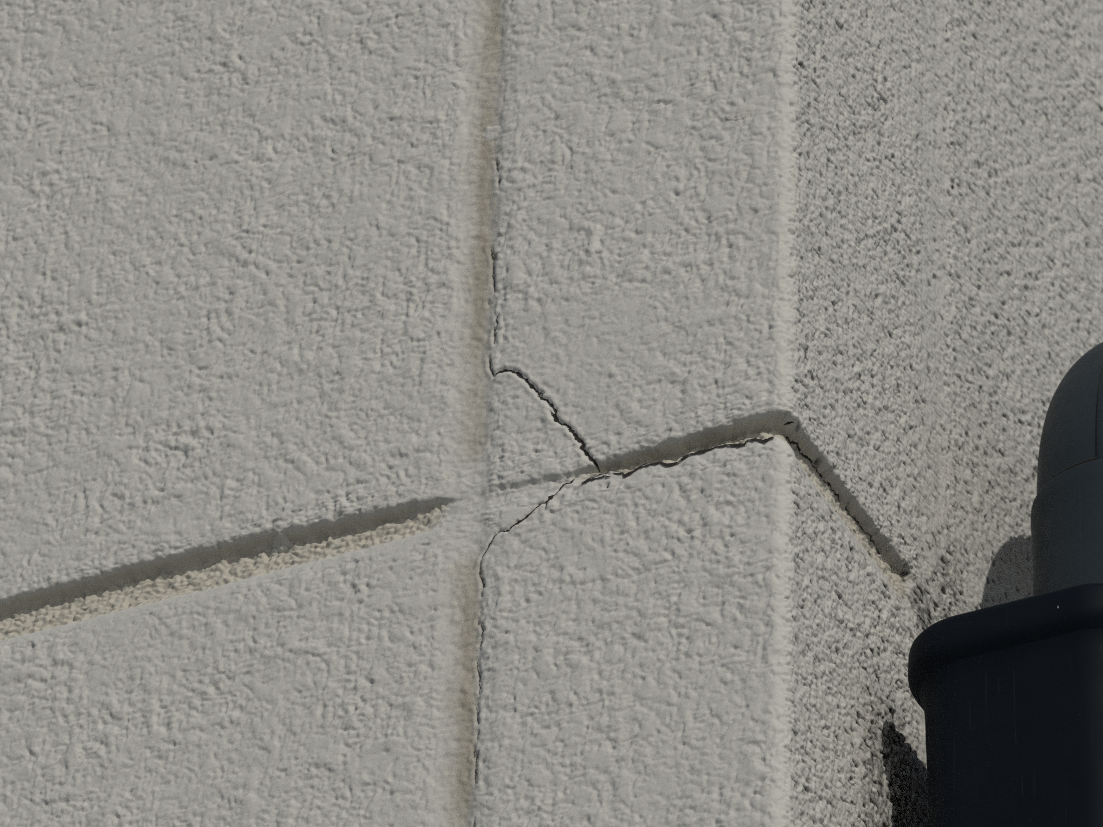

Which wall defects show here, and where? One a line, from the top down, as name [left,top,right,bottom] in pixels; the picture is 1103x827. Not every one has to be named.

crack [479,249,880,594]
crack [474,621,484,780]